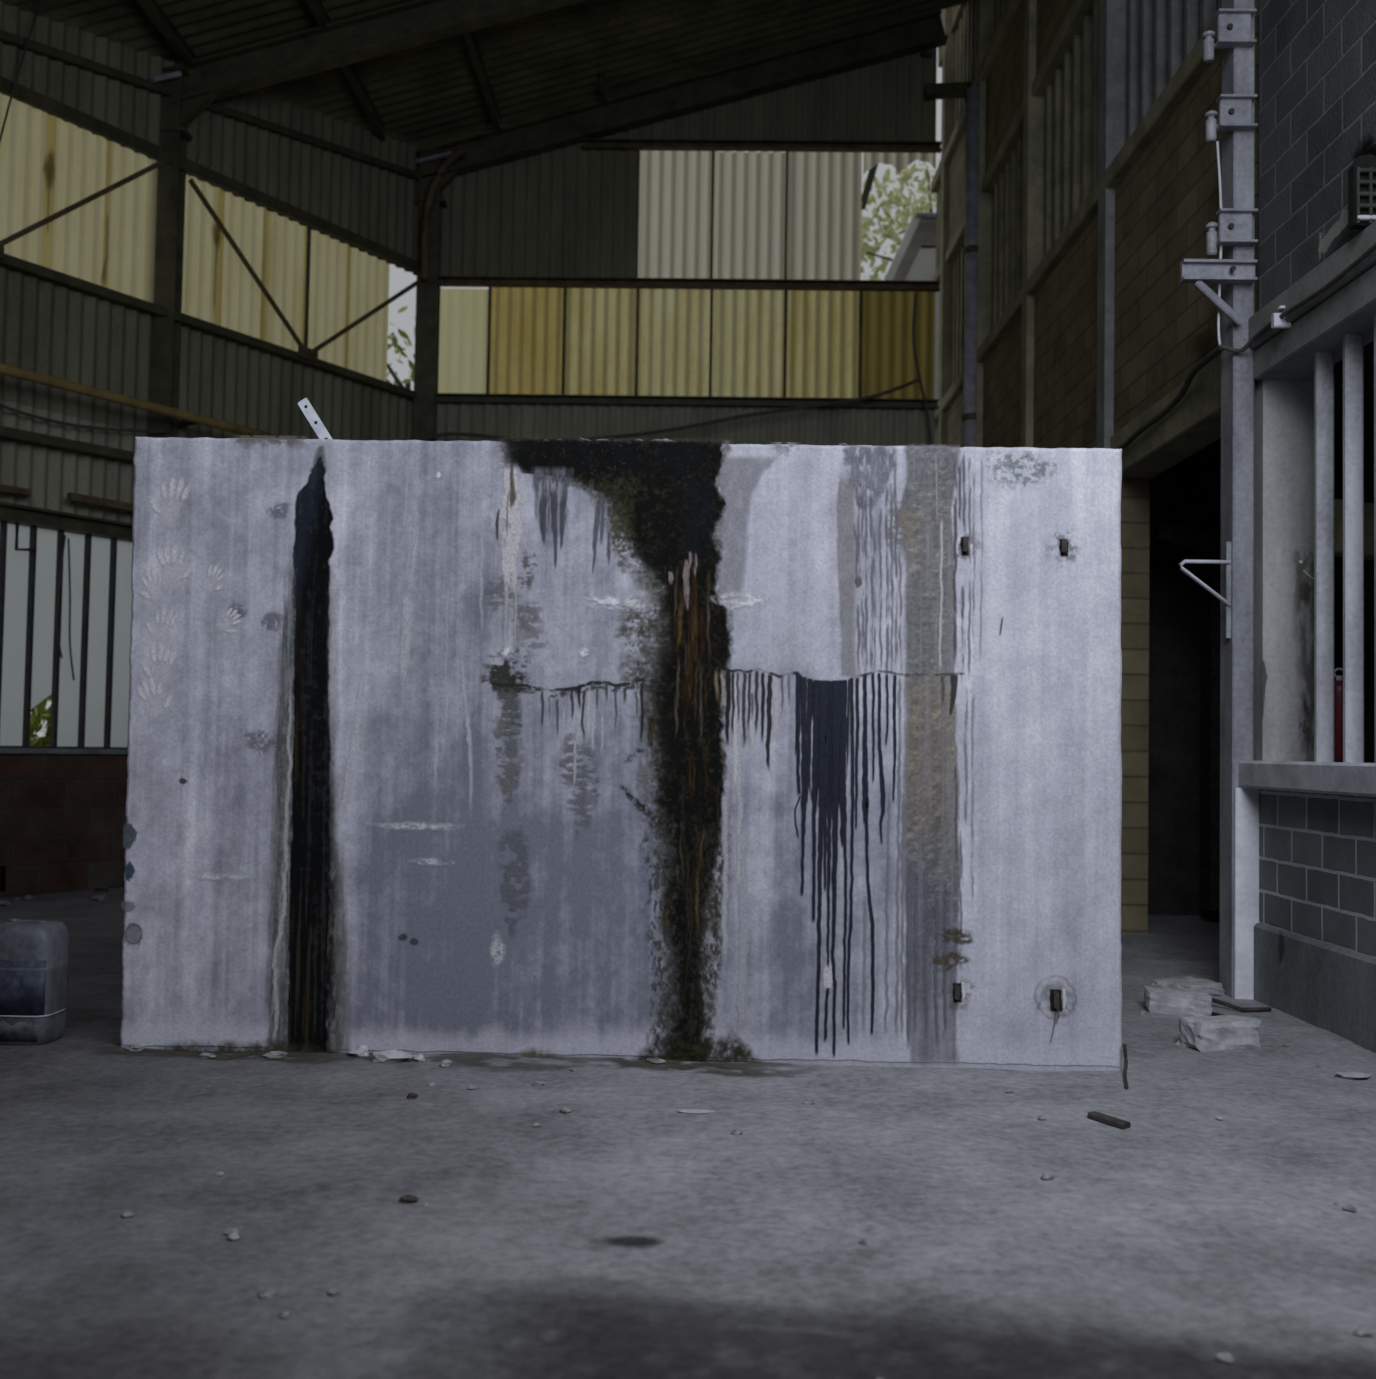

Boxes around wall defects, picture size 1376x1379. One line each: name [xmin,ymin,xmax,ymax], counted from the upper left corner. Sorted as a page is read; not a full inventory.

damp [269,455,365,1053]
damp [463,686,472,795]
damp [481,438,790,1062]
rust [670,553,720,731]
damp [838,446,902,675]
damp [885,457,983,1038]
damp [823,963,836,989]